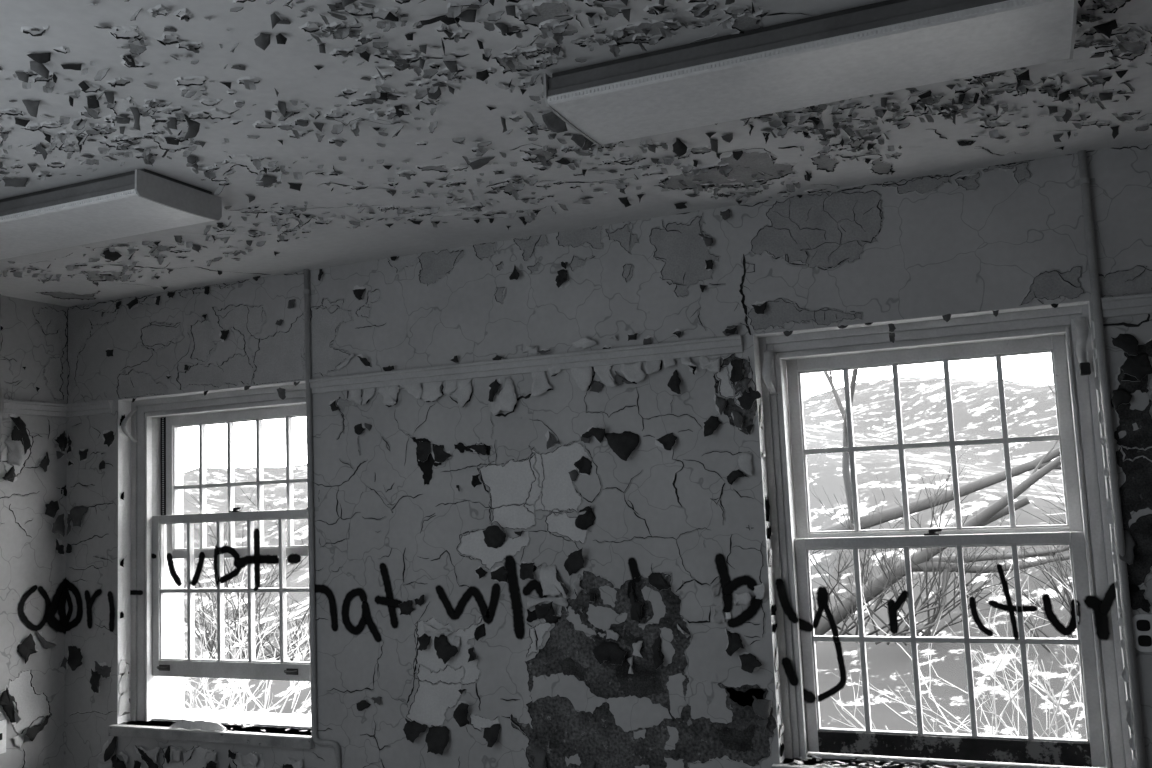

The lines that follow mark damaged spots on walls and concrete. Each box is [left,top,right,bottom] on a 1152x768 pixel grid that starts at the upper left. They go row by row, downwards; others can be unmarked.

peeling [0,0,1152,403]
crack [733,254,756,336]
peeling [0,414,106,482]
crack [0,416,114,583]
peeling [45,484,88,556]
peeling [102,415,125,447]
peeling [329,378,475,456]
spalling [1090,320,1152,649]
spalling [397,353,785,768]
peeling [356,697,382,711]
peeling [96,736,266,768]